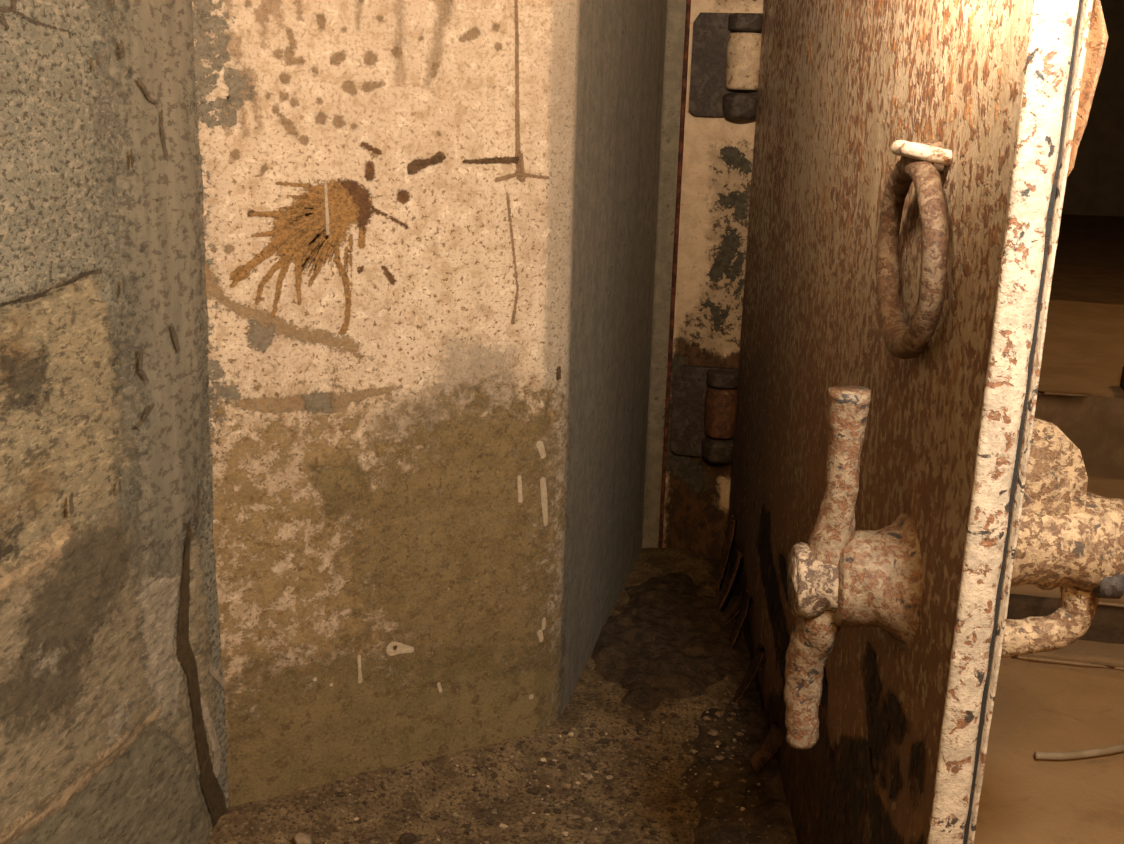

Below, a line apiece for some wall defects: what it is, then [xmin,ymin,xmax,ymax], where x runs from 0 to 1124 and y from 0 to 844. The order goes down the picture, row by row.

crack [0,0,76,35]
water stain [222,0,345,145]
water stain [316,98,358,129]
water stain [342,81,386,95]
water stain [364,51,377,65]
water stain [459,24,502,51]
rust [230,141,410,334]
water stain [201,265,362,359]
peeling [660,141,753,494]
water stain [136,542,183,726]
crack [177,490,227,828]
water stain [207,369,572,807]